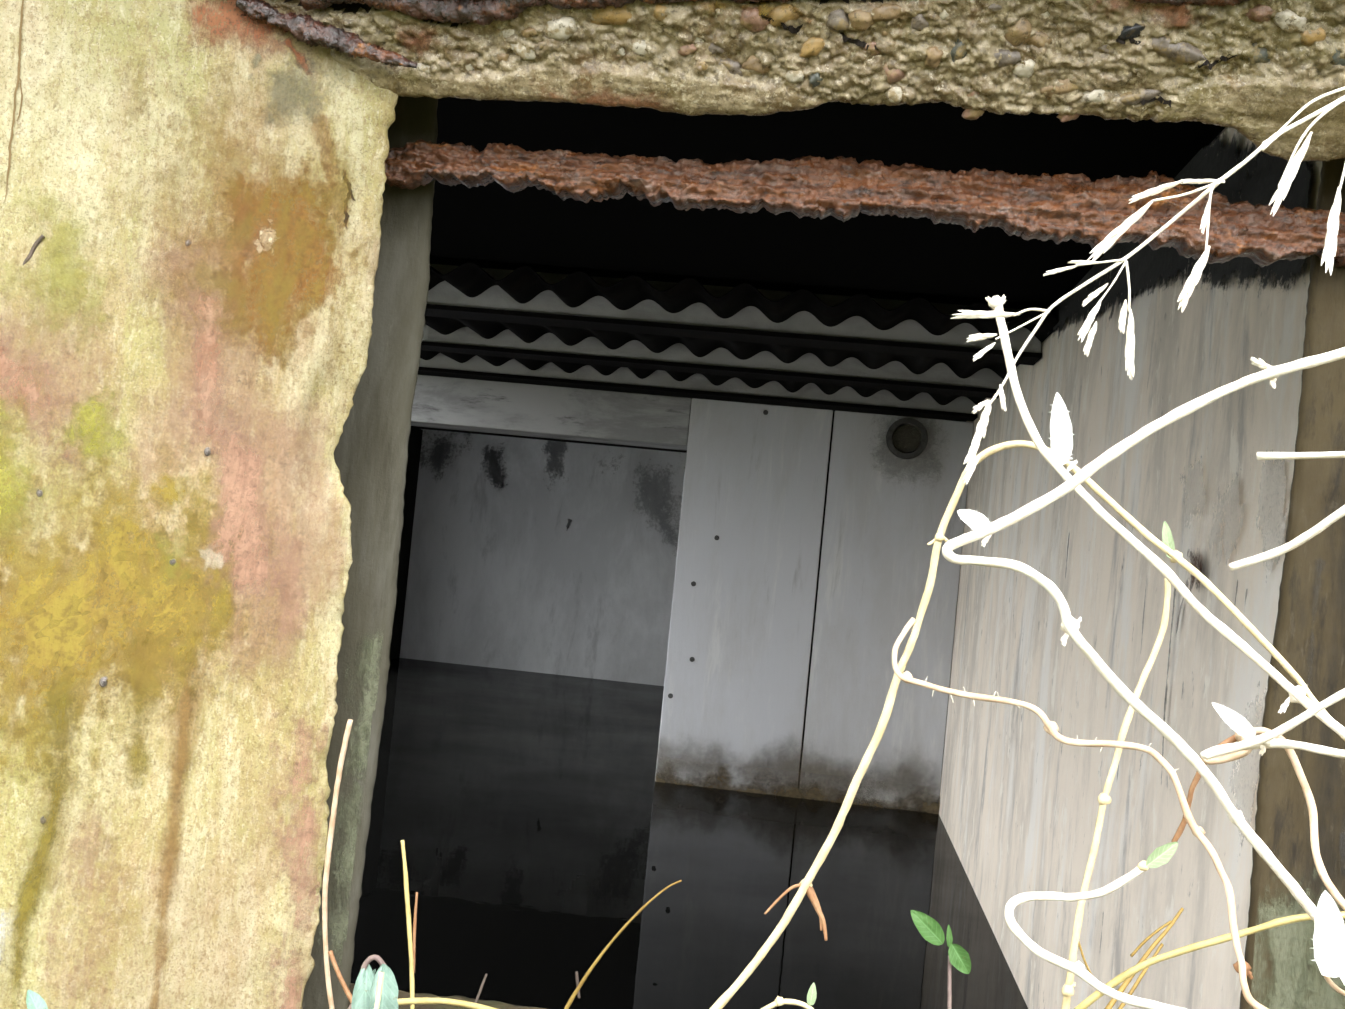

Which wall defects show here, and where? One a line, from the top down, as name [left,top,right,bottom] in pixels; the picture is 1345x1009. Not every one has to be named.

crack [5,0,24,200]
rust [188,0,434,75]
spalling [482,4,632,62]
spalling [739,3,800,32]
spalling [786,3,949,104]
spalling [962,87,984,120]
spalling [994,11,1161,122]
spalling [1098,8,1207,65]
spalling [1245,4,1345,66]
water stain [128,733,146,773]
water stain [0,694,70,984]
water stain [151,687,191,1009]